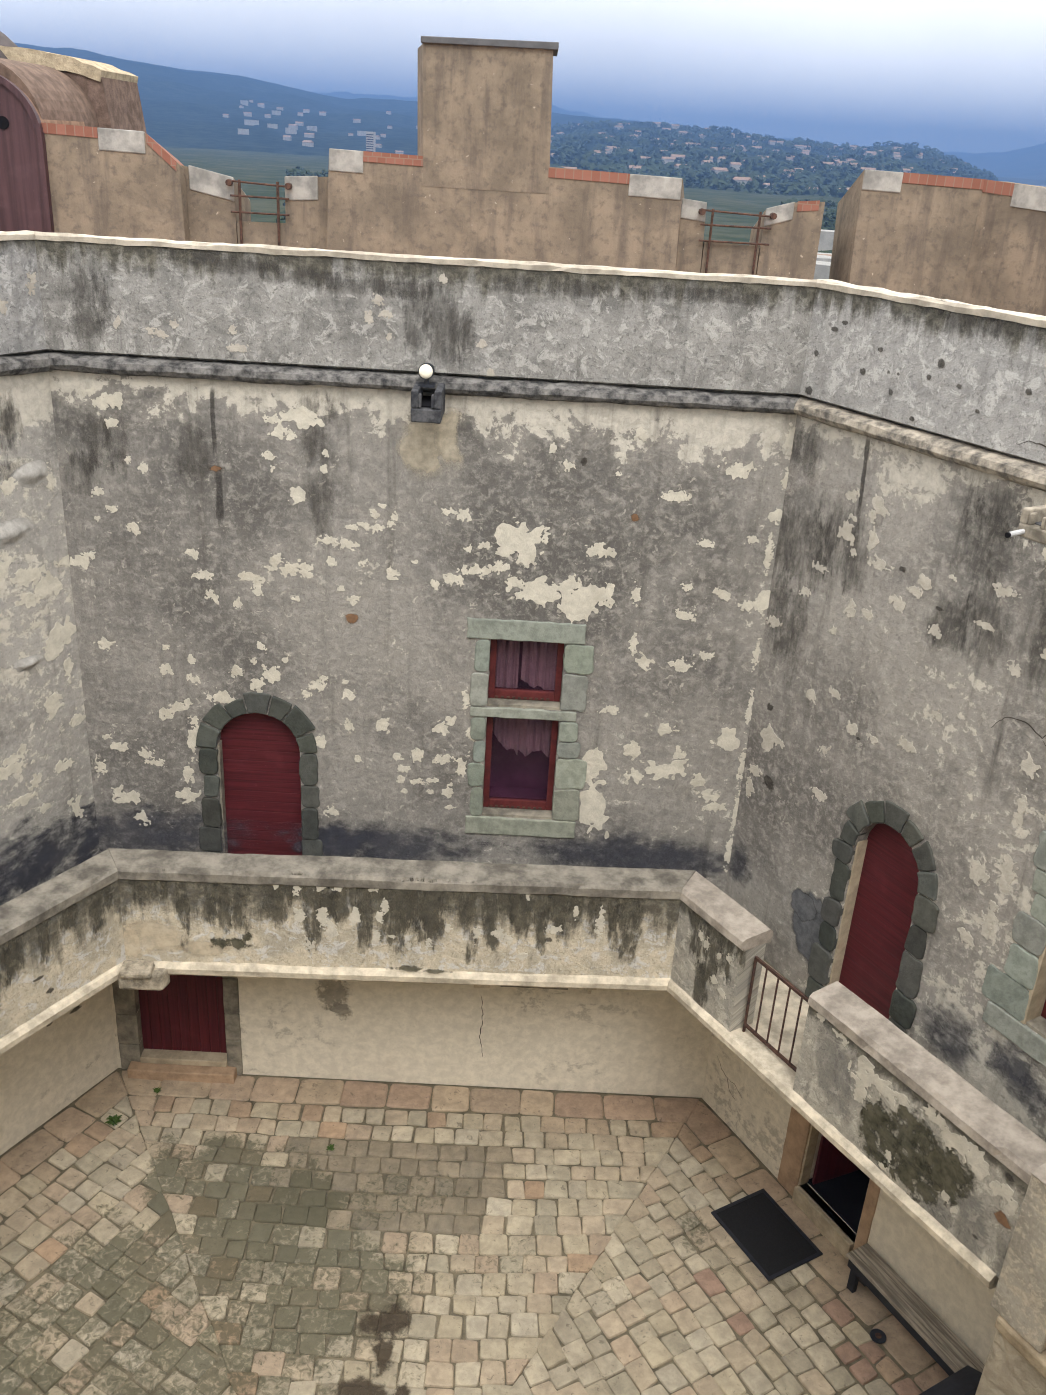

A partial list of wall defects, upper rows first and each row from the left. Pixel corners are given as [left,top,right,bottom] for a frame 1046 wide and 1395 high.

flaking render [261,405,325,473]
flaking render [185,503,398,609]
flaking render [430,517,641,624]
flaking render [393,687,476,810]
flaking render [579,747,609,839]
flaking render [623,508,785,872]
crack [991,717,1046,746]
damp [0,805,236,906]
damp [318,826,487,860]
damp [539,835,747,879]
damp [129,873,643,963]
damp [688,909,746,1007]